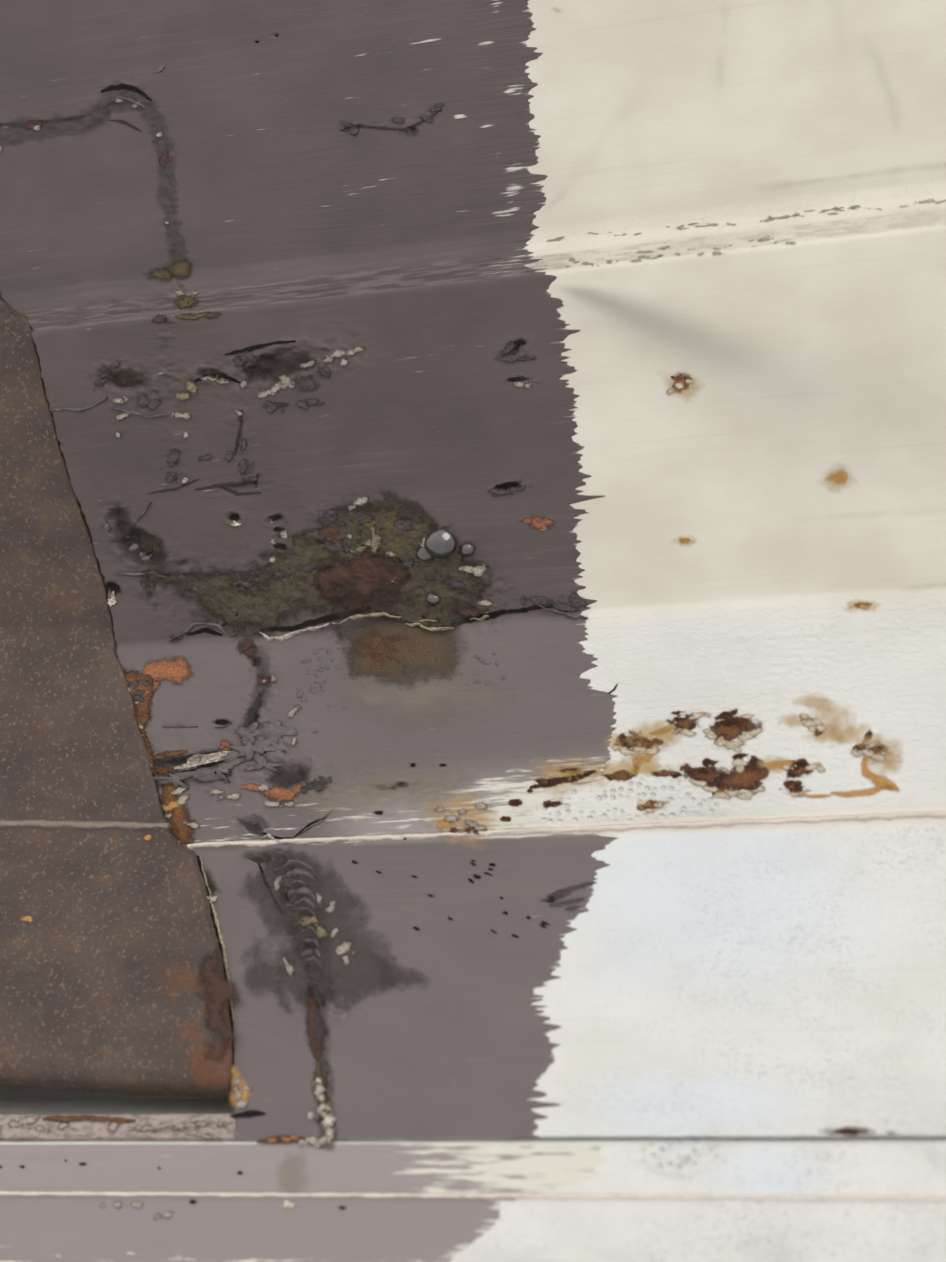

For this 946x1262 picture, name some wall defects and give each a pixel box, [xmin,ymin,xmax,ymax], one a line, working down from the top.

rust [666,373,693,395]
rust [828,471,847,483]
rust [123,657,199,846]
spalling [151,705,333,807]
rust [500,699,899,822]
rust [433,803,488,835]
damp [247,852,420,1008]
rust [306,994,328,1113]
rust [0,1065,332,1148]